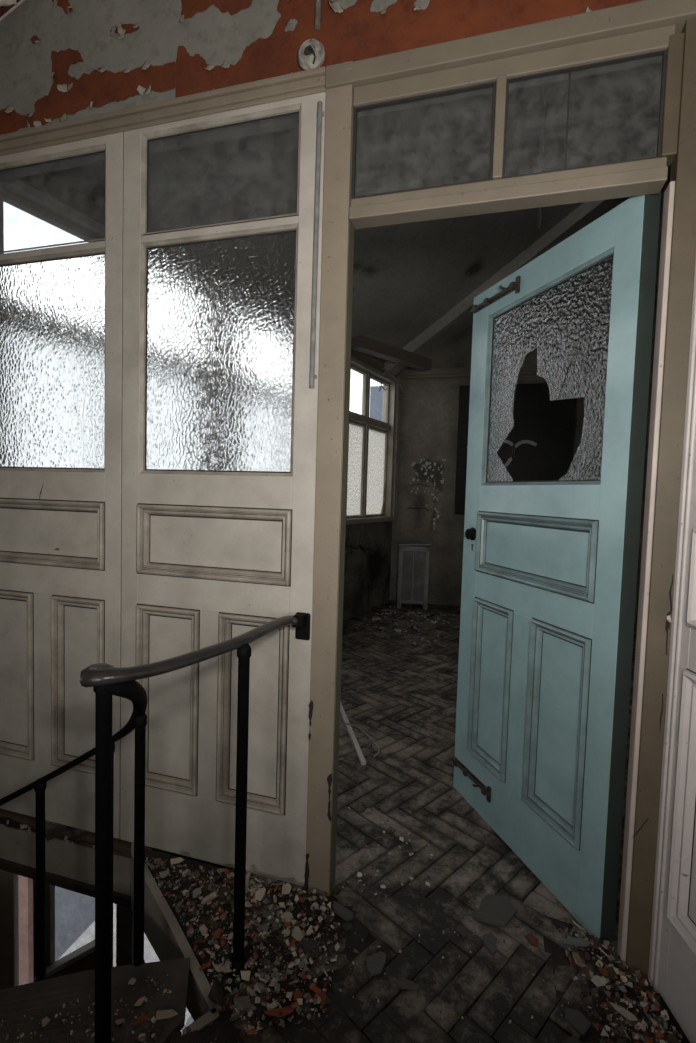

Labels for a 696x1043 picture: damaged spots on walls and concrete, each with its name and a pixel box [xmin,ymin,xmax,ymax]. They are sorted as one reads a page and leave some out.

peeling [0,0,642,135]